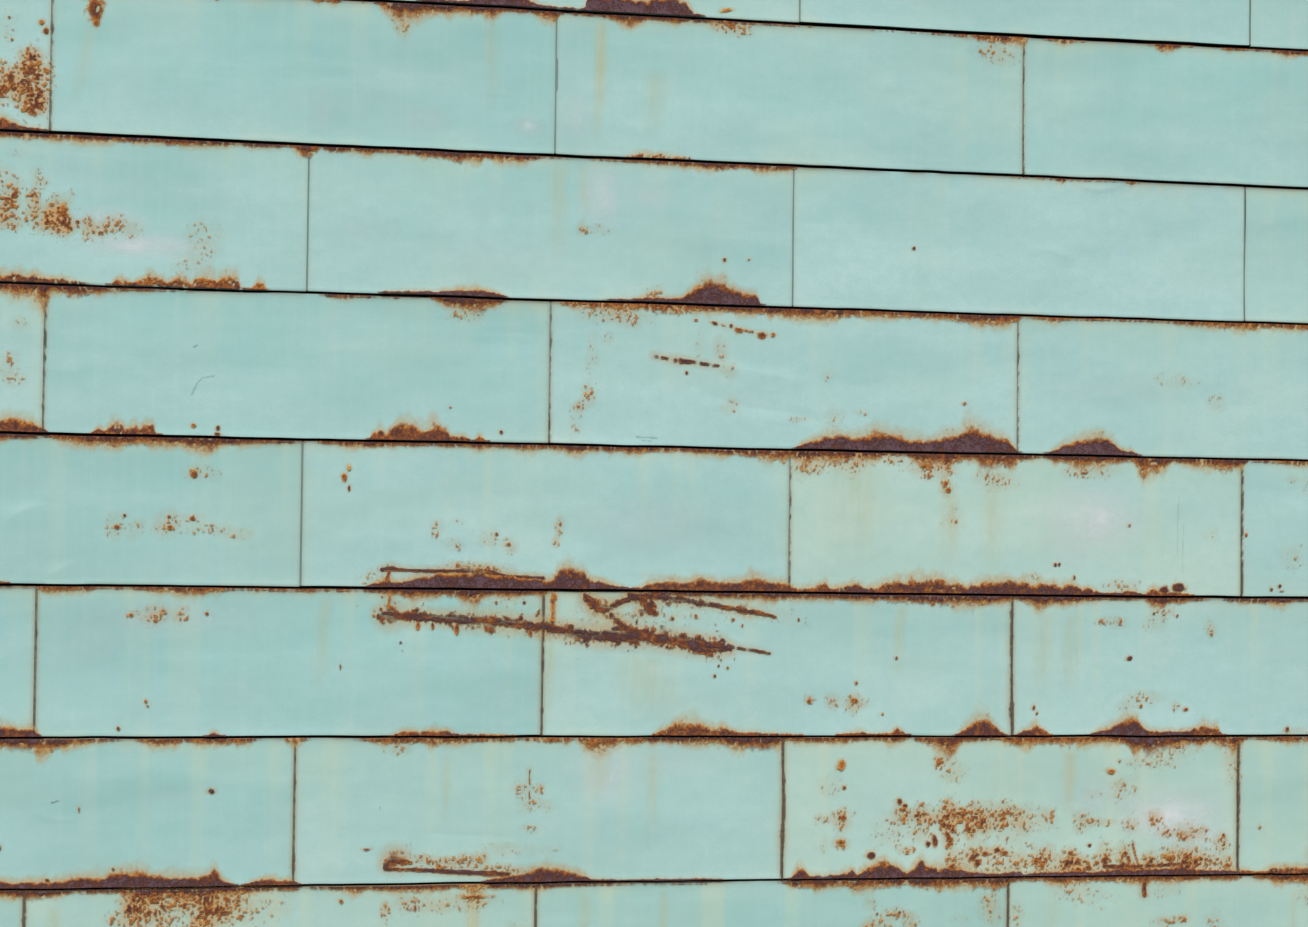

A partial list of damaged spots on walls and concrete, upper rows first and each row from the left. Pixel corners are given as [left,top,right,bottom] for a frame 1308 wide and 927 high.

rust [362,0,812,34]
rust [0,38,569,162]
rust [551,280,1308,338]
rust [317,407,1308,605]
rust [0,542,1308,927]